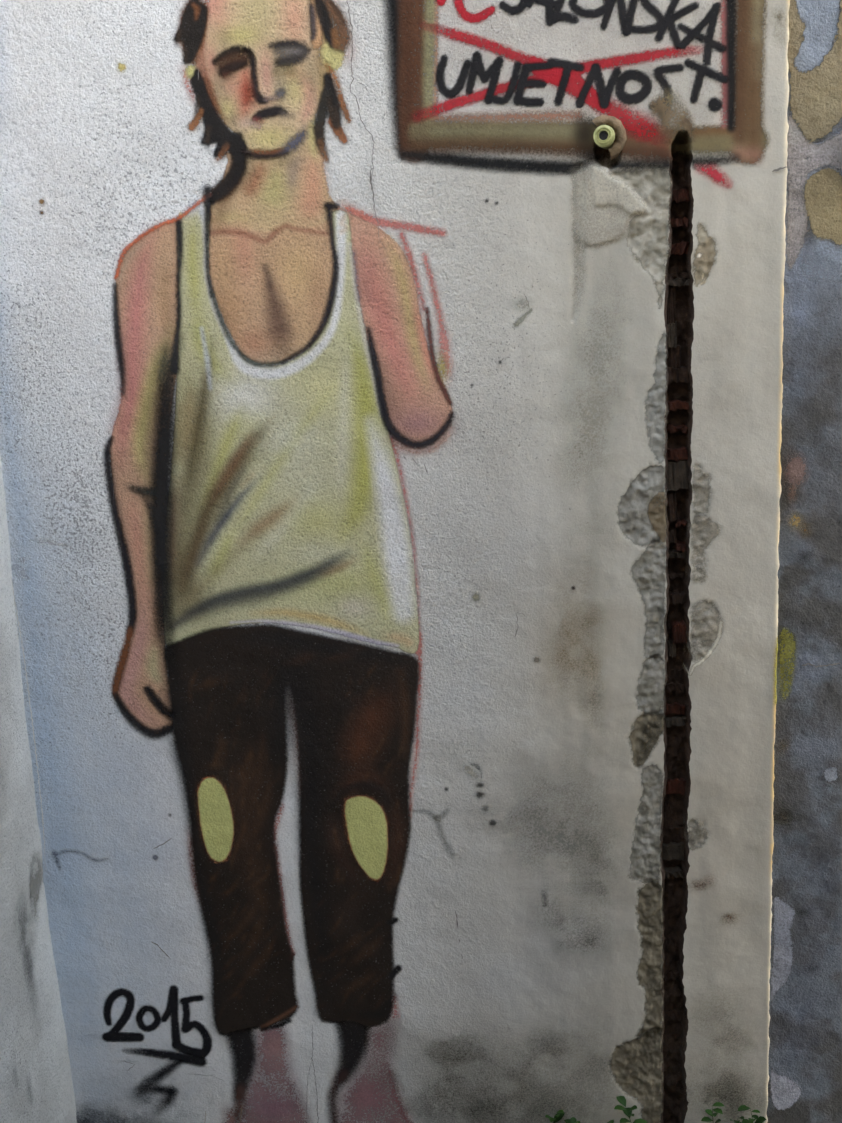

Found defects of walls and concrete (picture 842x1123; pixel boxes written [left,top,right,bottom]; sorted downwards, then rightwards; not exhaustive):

crack [347,3,385,248]
peeling [787,0,842,143]
spalling [610,166,671,309]
spalling [693,224,717,287]
peeling [801,168,842,281]
spalling [688,464,720,582]
spalling [685,600,723,675]
spalling [610,333,667,1123]
spalling [685,820,707,850]
damp [412,1038,594,1123]